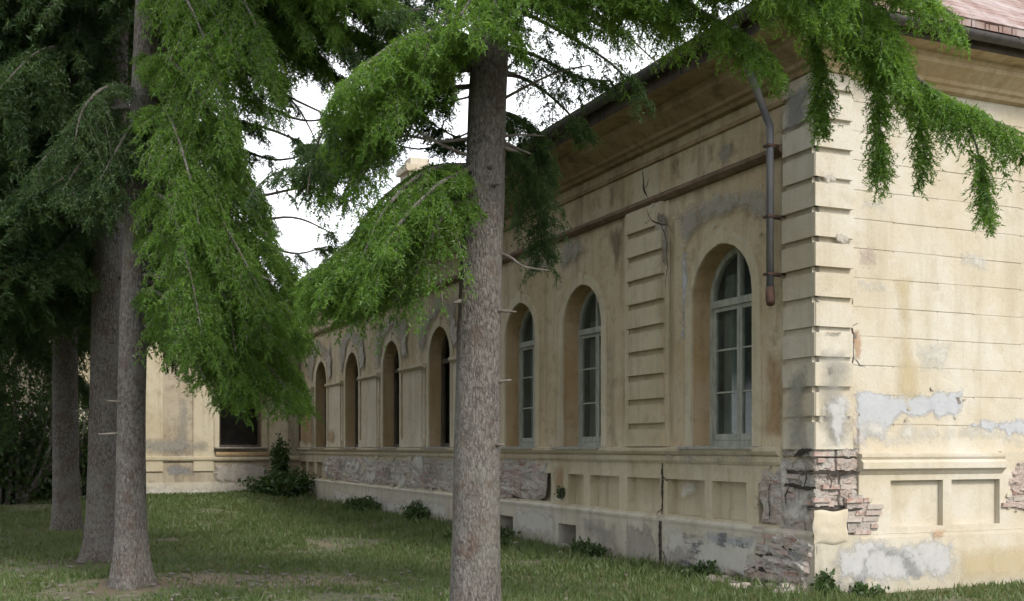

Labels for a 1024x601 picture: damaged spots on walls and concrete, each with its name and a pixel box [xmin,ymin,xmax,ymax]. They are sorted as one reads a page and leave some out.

crack [642,170,673,284]
crack [851,300,865,367]
spalling [322,452,453,516]
spalling [500,458,553,535]
crack [656,463,668,561]
spalling [666,387,966,592]
spalling [1001,461,1024,512]